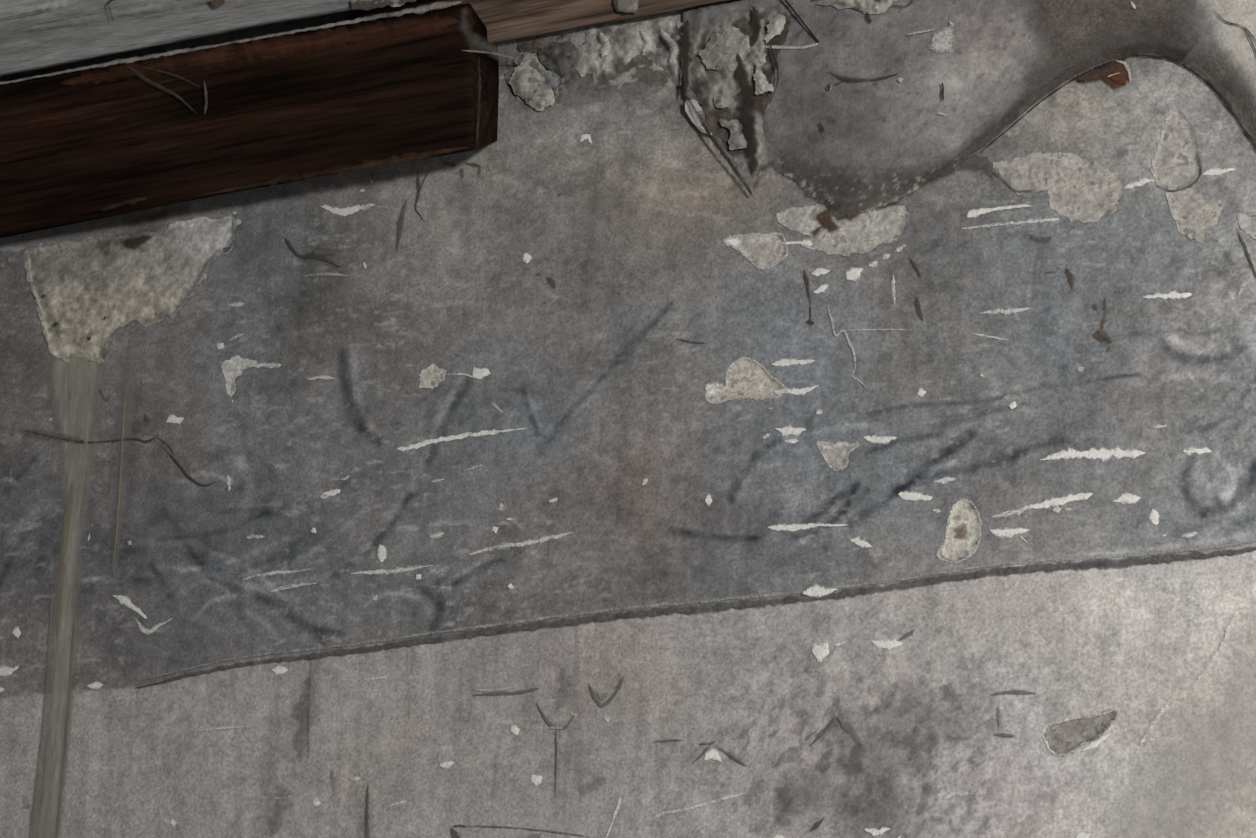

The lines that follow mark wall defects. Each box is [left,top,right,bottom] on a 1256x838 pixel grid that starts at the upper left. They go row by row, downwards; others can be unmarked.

flaking render [503,3,819,195]
rust [1078,60,1131,89]
flaking render [993,151,1128,223]
flaking render [1150,106,1256,243]
flaking render [723,203,910,294]
flaking render [705,357,788,409]
crack [21,414,217,486]
flaking render [898,491,981,563]
damp [30,353,105,838]
peeling [802,585,839,597]
flaking render [1042,709,1119,757]
flaking render [1153,726,1256,838]